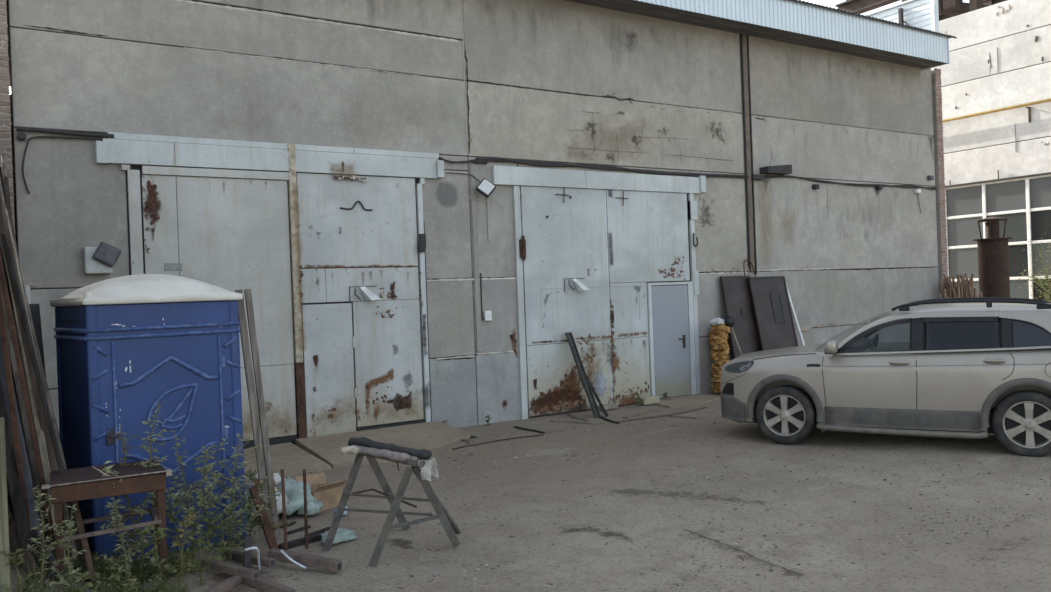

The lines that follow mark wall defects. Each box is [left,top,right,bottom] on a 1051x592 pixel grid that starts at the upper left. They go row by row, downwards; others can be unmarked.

crack [465,49,732,164]
corrosion [140,174,161,254]
corrosion [299,265,421,299]
corrosion [376,282,399,318]
corrosion [356,370,412,420]
corrosion [529,300,649,414]